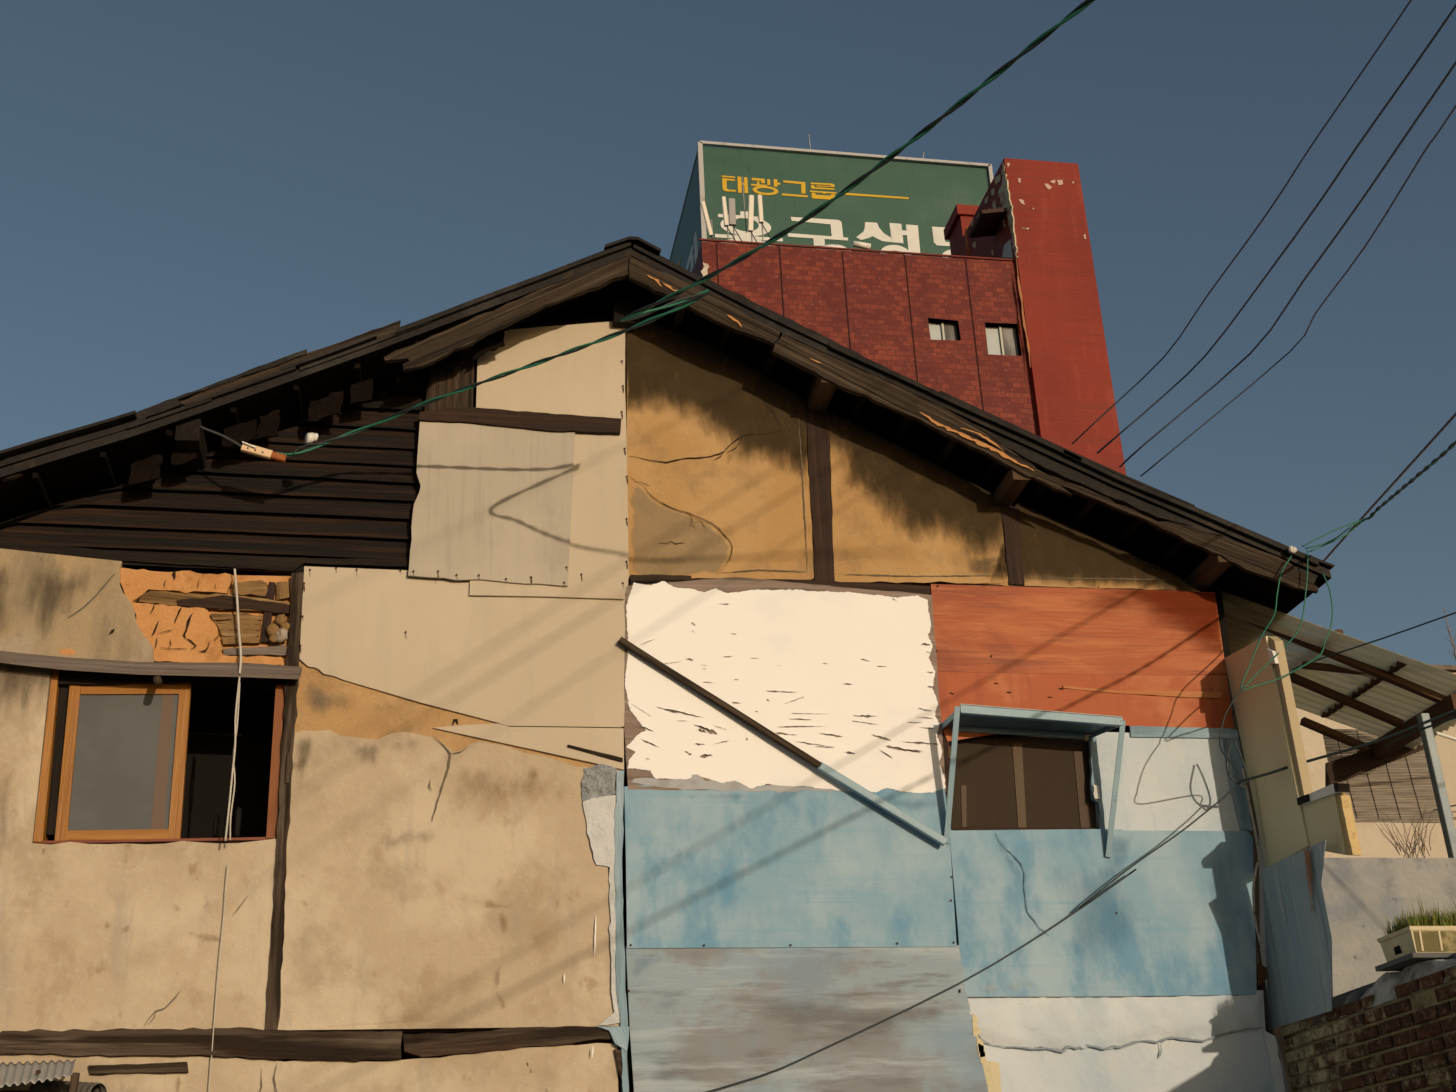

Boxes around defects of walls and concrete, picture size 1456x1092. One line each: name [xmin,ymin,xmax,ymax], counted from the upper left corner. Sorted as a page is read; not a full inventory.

peeling [970,161,1034,257]
crack [632,406,789,568]
damp [626,317,1220,641]
damp [4,665,50,688]
flaking render [120,568,596,768]
peeling [615,581,946,793]